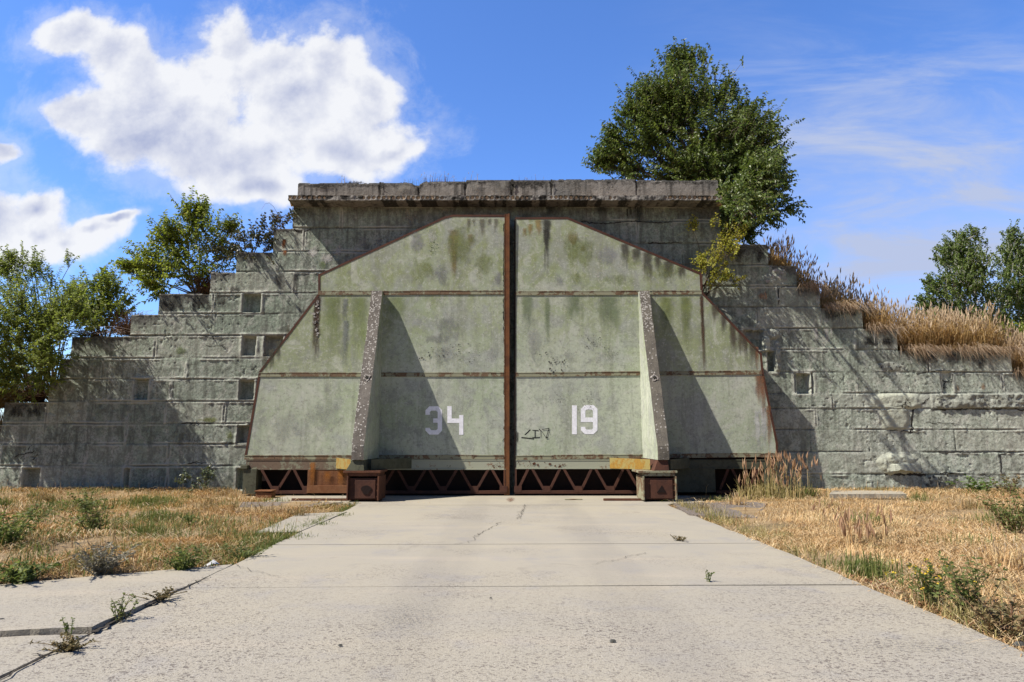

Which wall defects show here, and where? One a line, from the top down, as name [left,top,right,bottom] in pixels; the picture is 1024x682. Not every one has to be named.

leakage [544,207,561,252]
leakage [622,244,684,276]
leakage [312,297,321,349]
crack [80,575,210,640]
crack [0,647,56,681]